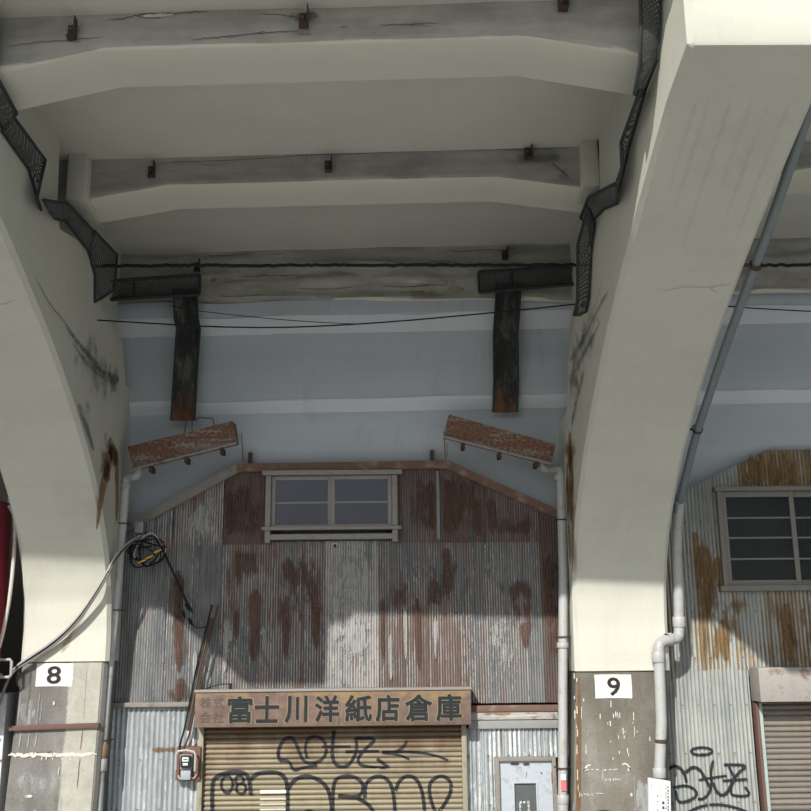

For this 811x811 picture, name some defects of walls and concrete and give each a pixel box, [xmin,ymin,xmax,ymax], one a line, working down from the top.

crack [6,11,207,46]
crack [194,13,313,40]
corrosion [96,438,119,530]
corrosion [565,432,575,570]
corrosion [745,454,797,486]
corrosion [227,550,261,661]
corrosion [277,558,321,661]
corrosion [380,548,457,670]
corrosion [500,581,535,648]
corrosion [696,545,745,661]